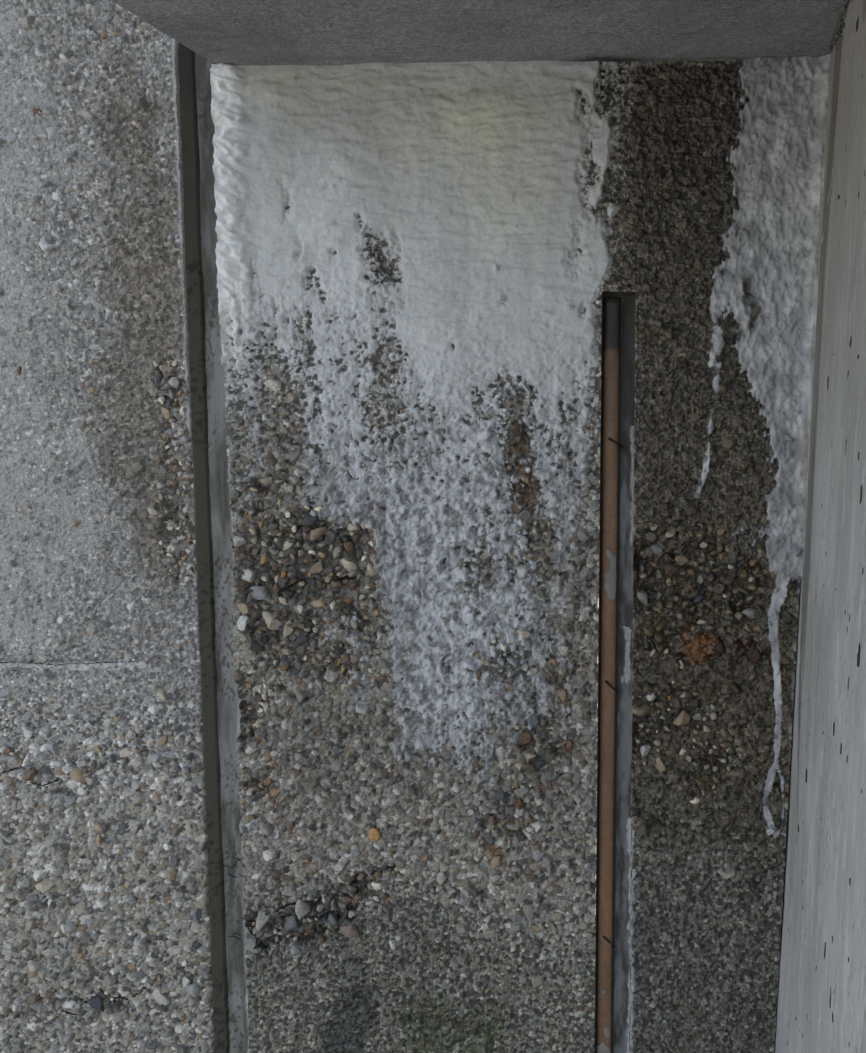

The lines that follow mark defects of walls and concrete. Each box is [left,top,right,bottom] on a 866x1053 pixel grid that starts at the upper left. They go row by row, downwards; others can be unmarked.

damp [210,30,841,1053]